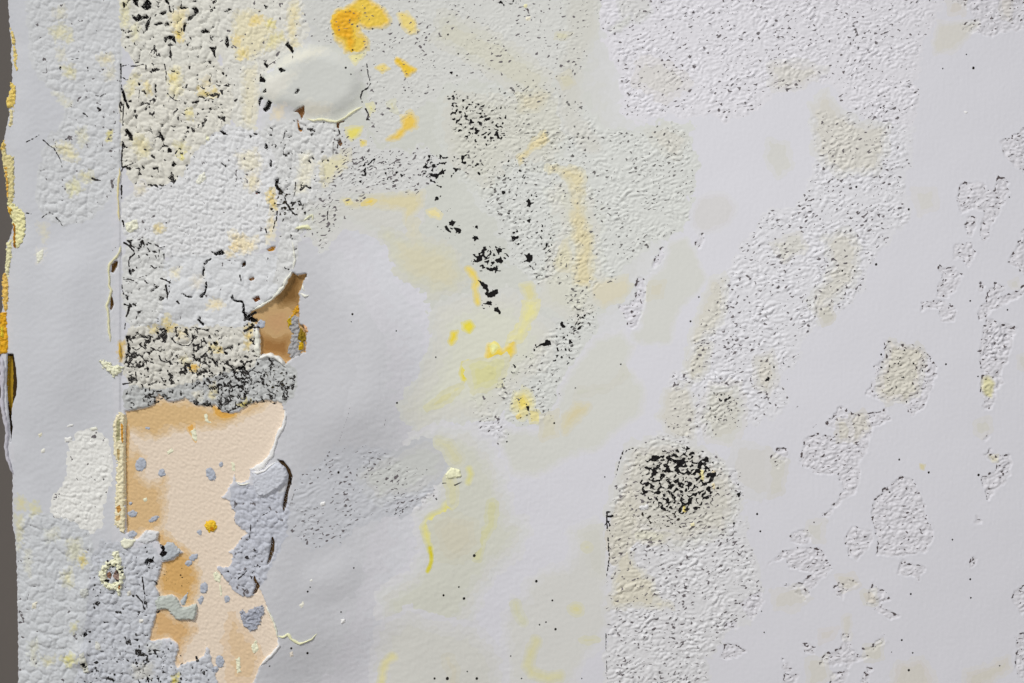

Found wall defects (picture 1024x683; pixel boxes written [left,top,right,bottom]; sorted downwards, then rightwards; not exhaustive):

peeling [254,328,286,367]
peeling [252,272,292,311]
leakage [2,0,796,683]
peeling [98,412,181,596]
peeling [235,411,289,498]
peeling [770,341,937,517]
peeling [844,476,933,581]
peeling [155,592,198,620]